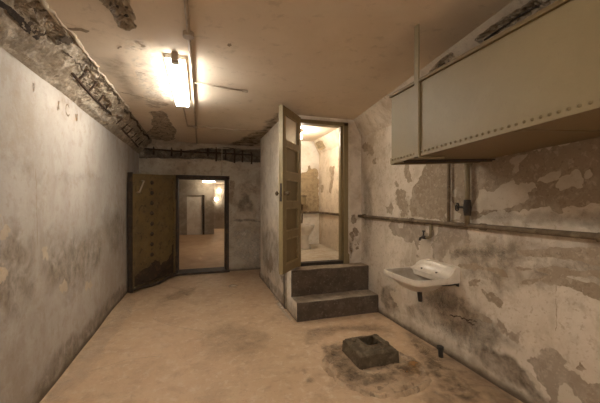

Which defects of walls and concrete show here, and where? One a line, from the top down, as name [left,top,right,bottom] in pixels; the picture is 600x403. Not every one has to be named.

flaking render [99,0,137,31]
spalling [475,0,558,44]
spalling [0,0,130,115]
spalling [139,111,261,164]
peeling [301,165,335,211]
peeling [386,137,600,263]
peeling [468,279,503,308]
peeling [515,247,600,301]
damp [480,348,533,394]
peeling [526,347,600,403]